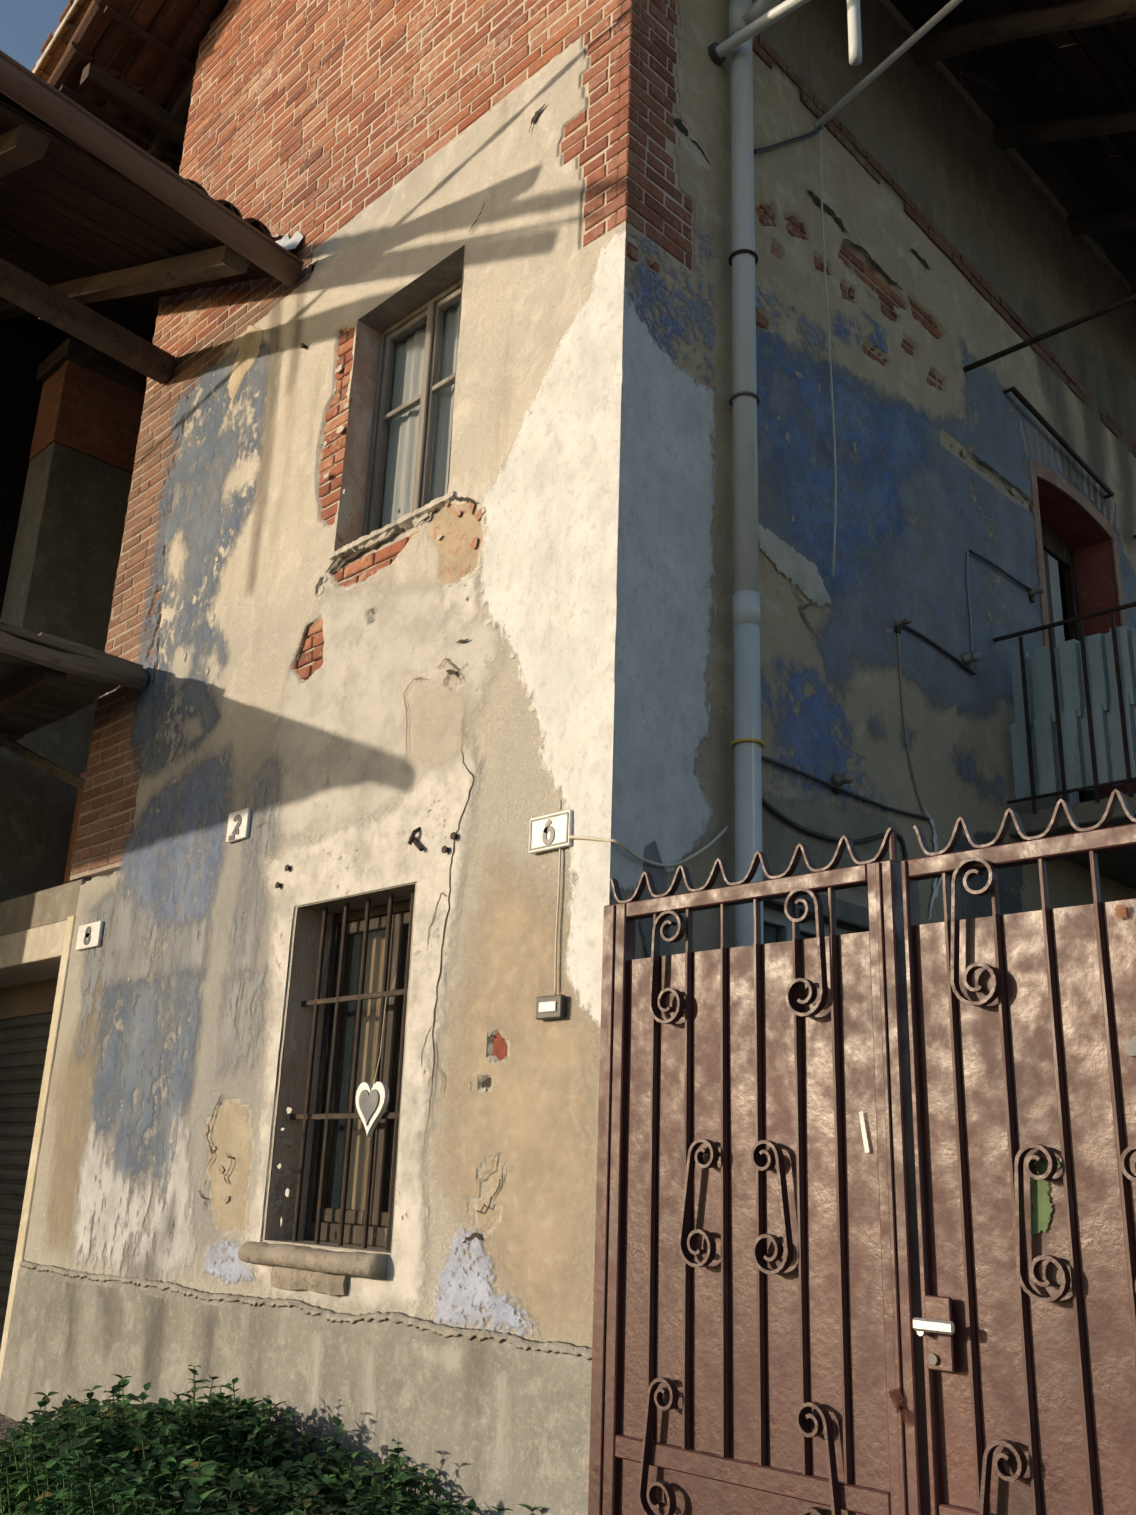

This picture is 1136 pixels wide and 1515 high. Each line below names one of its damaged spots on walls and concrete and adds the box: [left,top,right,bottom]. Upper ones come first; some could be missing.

spalling [674,118,710,163]
peeling [755,204,1136,812]
peeling [76,327,537,1335]
crack [421,694,483,1164]
peeling [951,831,1009,853]
peeling [950,865,1023,920]